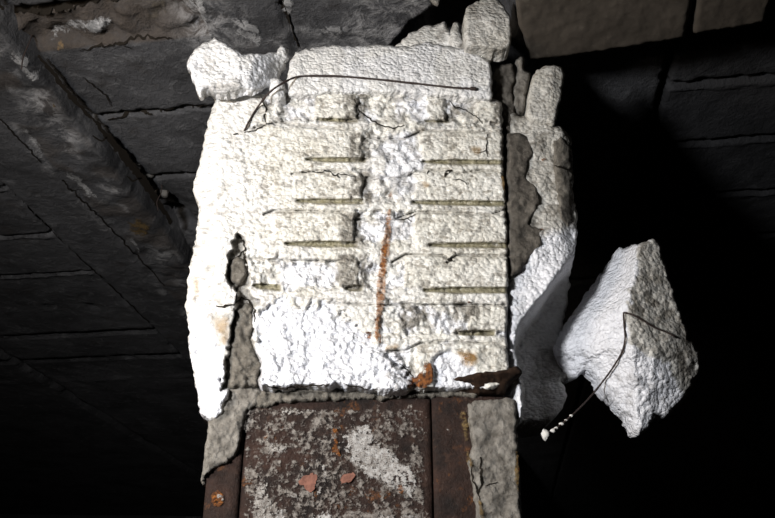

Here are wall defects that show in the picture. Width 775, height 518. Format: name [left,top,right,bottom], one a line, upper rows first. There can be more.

spalling [53,17,110,33]
crack [37,55,207,225]
corrosion [366,209,391,347]
corrosion [407,363,434,388]
corrosion [340,472,355,484]